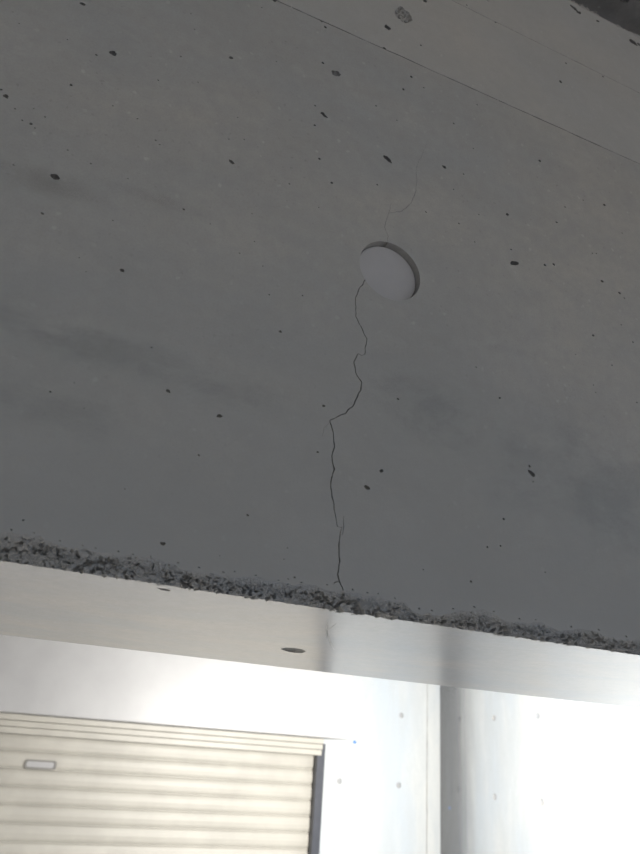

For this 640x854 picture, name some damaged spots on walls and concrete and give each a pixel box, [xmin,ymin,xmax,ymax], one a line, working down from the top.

crack [322,282,367,599]